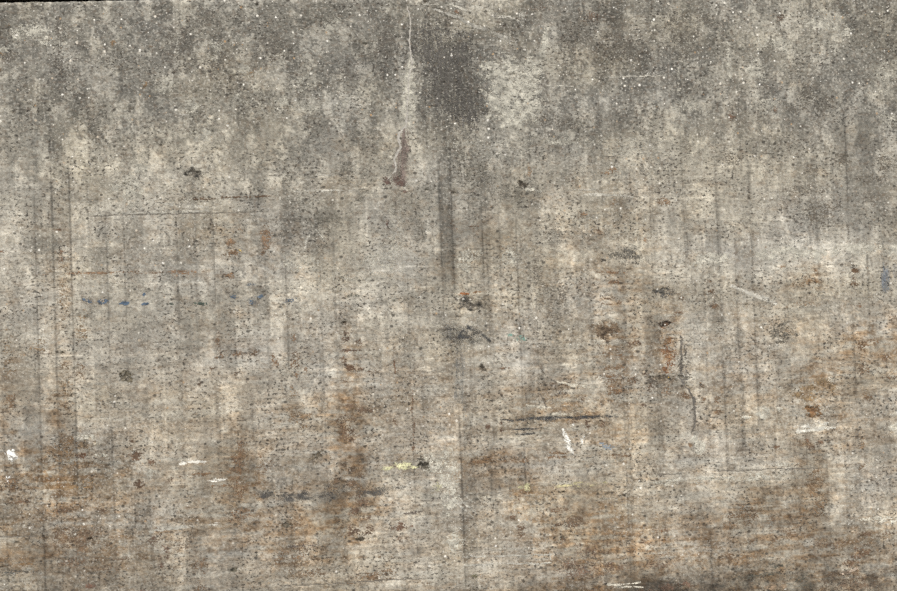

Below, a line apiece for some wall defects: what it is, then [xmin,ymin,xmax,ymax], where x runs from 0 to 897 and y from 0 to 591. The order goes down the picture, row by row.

water stain [154,23,227,79]
water stain [559,17,649,76]
water stain [656,9,731,61]
crack [387,4,413,180]
corrosion [383,176,407,193]
water stain [370,18,538,306]
water stain [830,150,897,186]
crack [679,349,696,432]